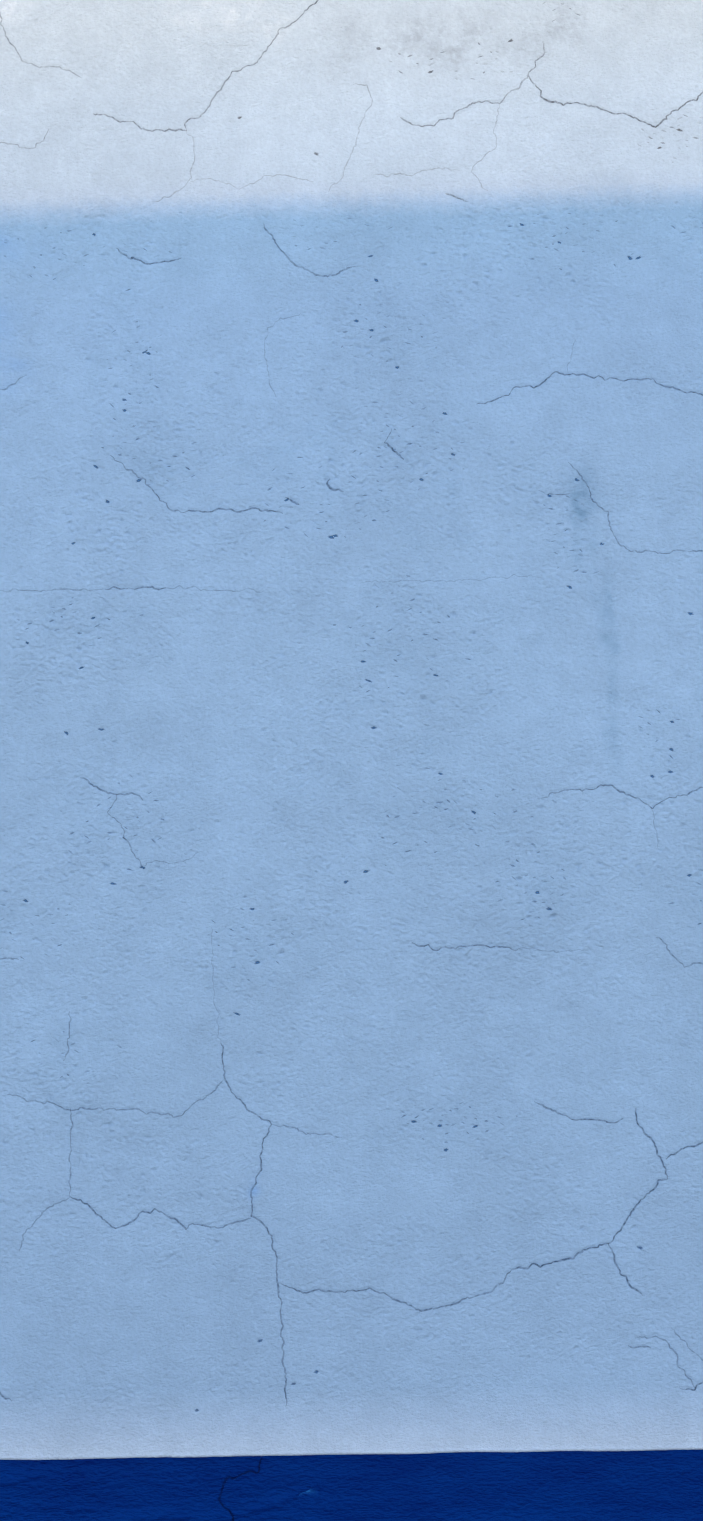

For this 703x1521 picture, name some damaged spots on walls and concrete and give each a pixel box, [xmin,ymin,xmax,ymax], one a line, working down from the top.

crack [507,1113,701,1288]